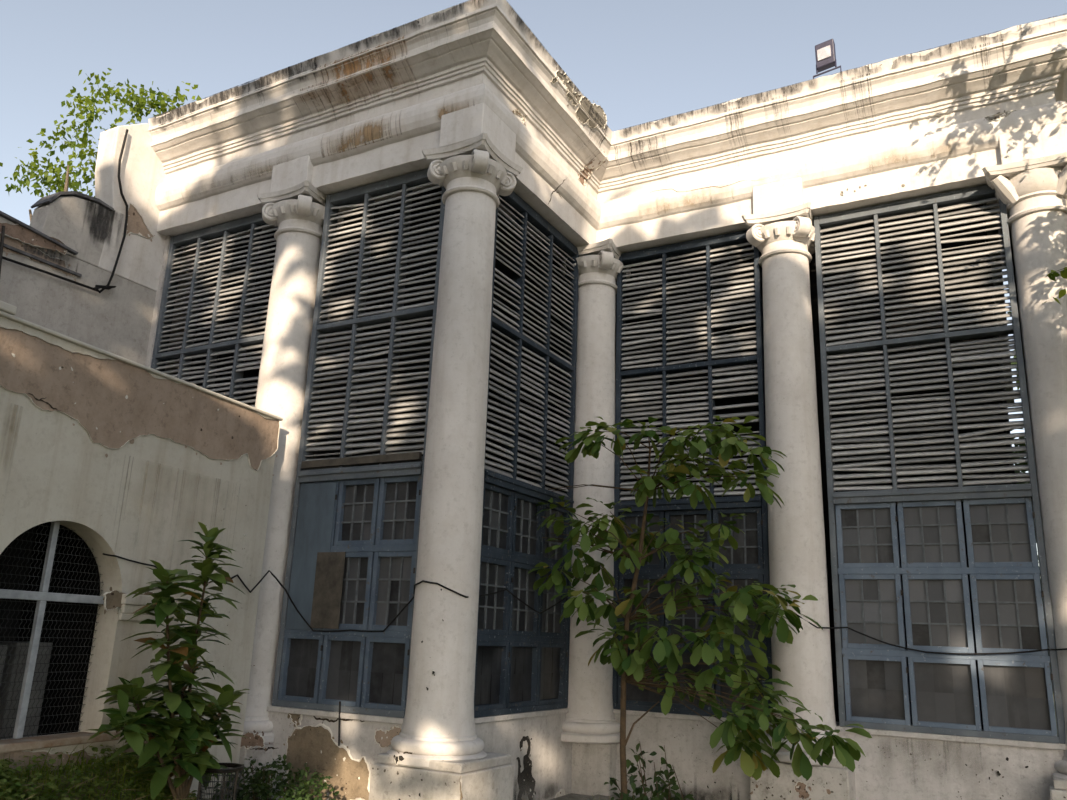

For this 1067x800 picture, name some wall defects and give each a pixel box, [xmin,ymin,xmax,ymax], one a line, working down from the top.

corrosion [302,37,405,102]
damp [623,82,812,157]
damp [89,200,115,240]
peeling [126,203,155,242]
peeling [0,327,280,471]
peeling [240,730,270,751]
spalling [283,713,404,800]